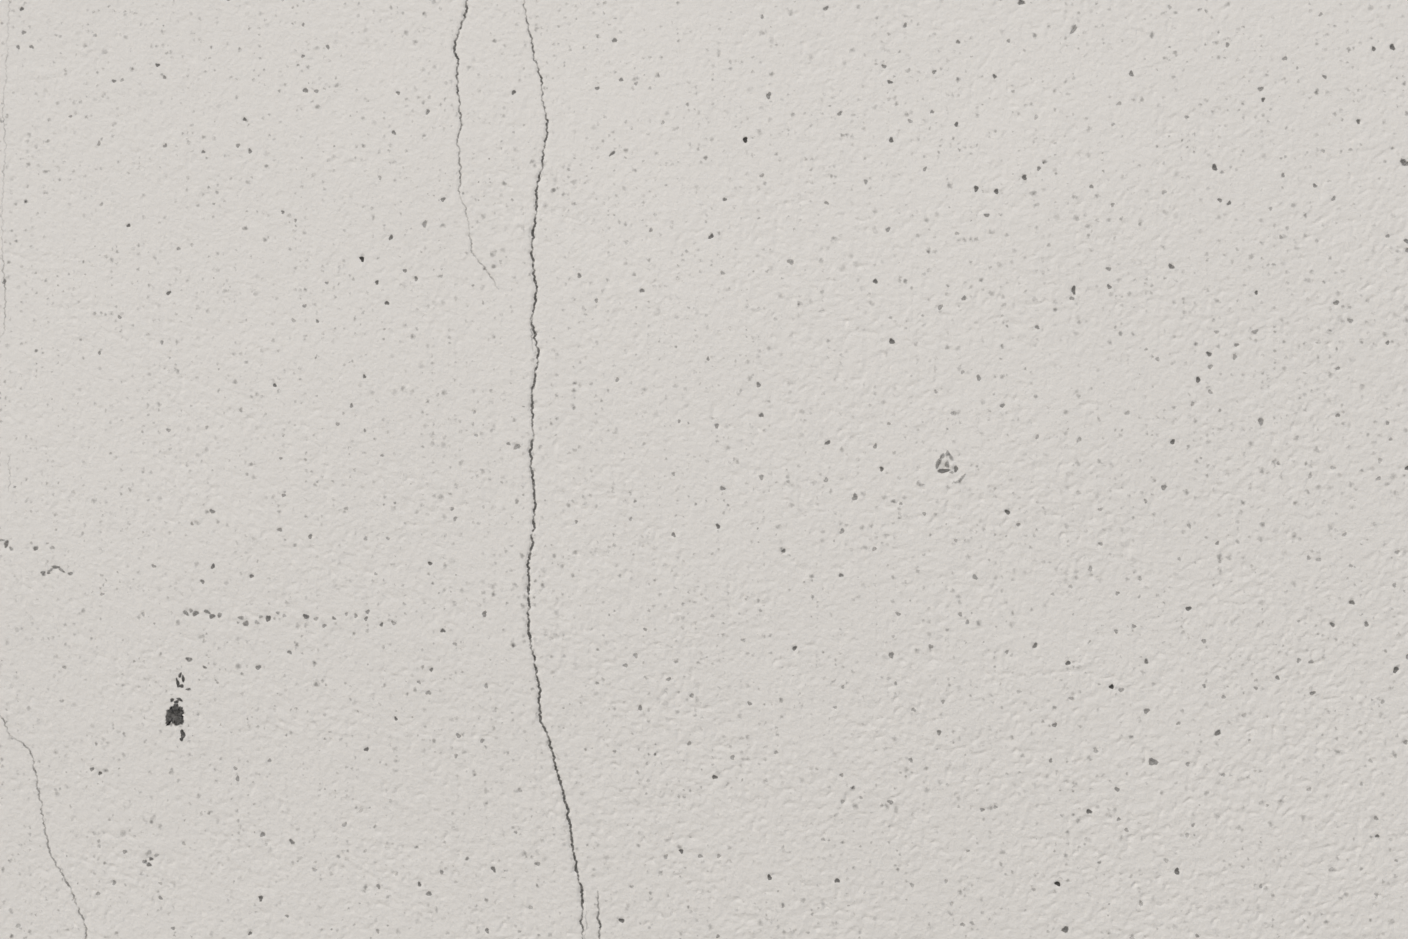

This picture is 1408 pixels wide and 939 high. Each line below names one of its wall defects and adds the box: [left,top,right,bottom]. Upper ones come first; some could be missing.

crack [453,2,468,183]
crack [526,20,601,937]